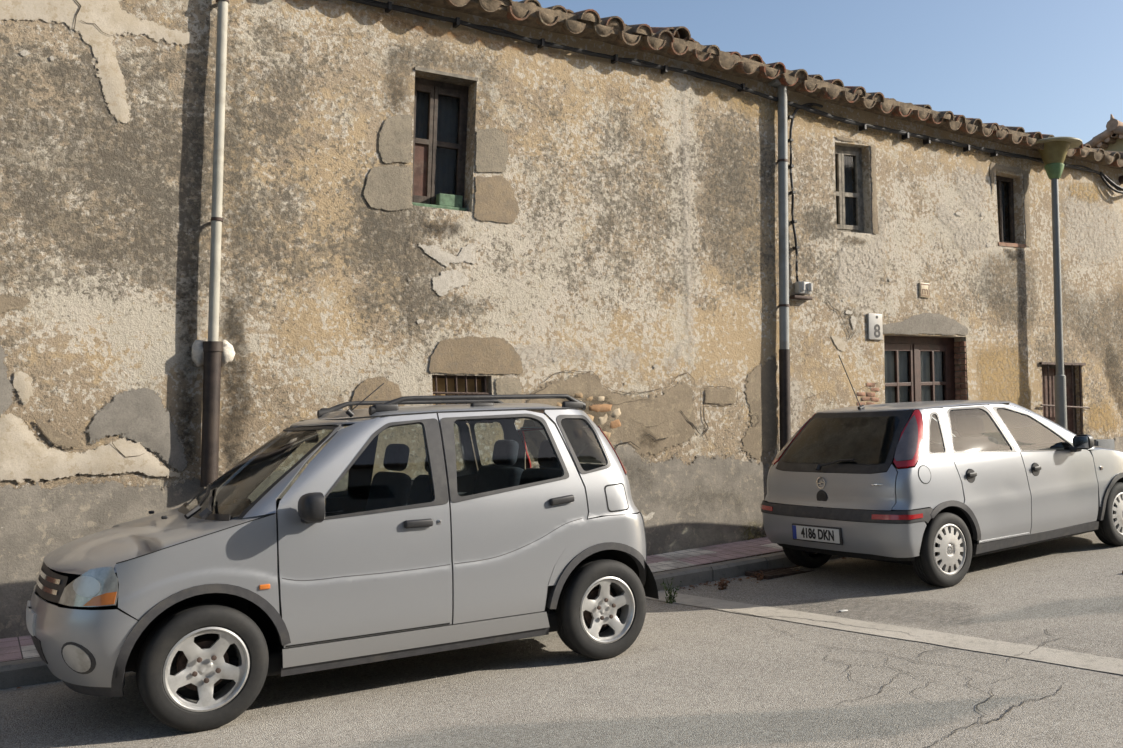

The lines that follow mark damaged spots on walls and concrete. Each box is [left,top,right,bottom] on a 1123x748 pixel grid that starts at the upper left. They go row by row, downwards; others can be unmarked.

crack [74,0,113,36]
water stain [653,88,1032,370]
water stain [180,280,197,354]
peeling [0,369,181,484]
water stain [223,310,250,463]
peeling [526,357,780,459]
crack [680,405,709,441]